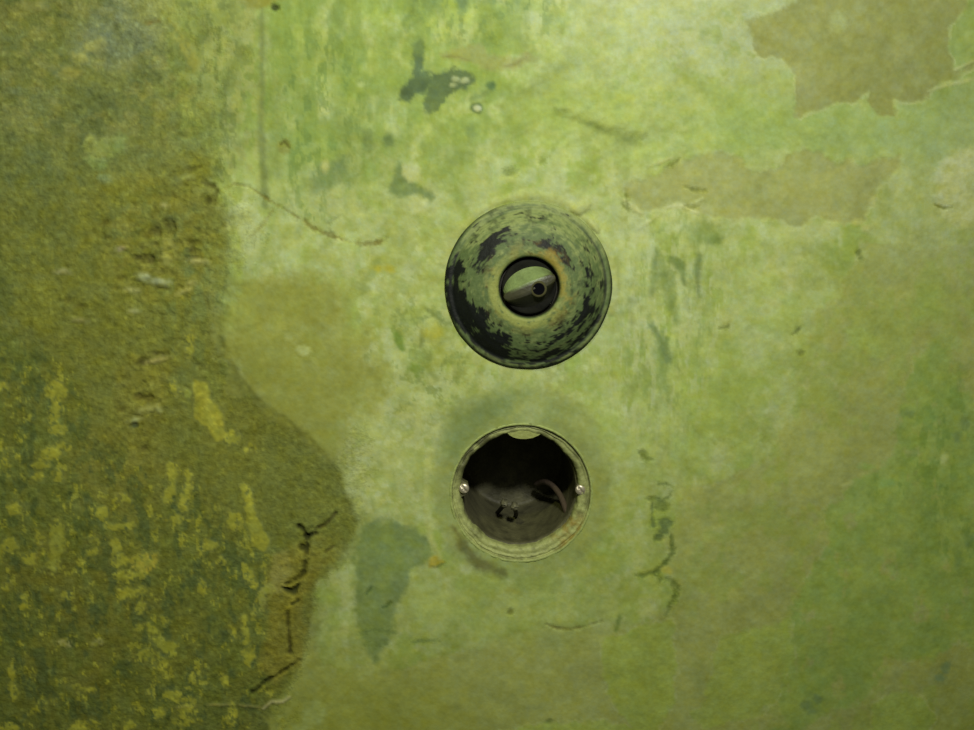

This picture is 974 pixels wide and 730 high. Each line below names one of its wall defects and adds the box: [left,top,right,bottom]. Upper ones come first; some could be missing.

leakage [224,0,288,212]
peeling [742,0,974,121]
crack [173,510,338,711]
crack [632,480,684,619]